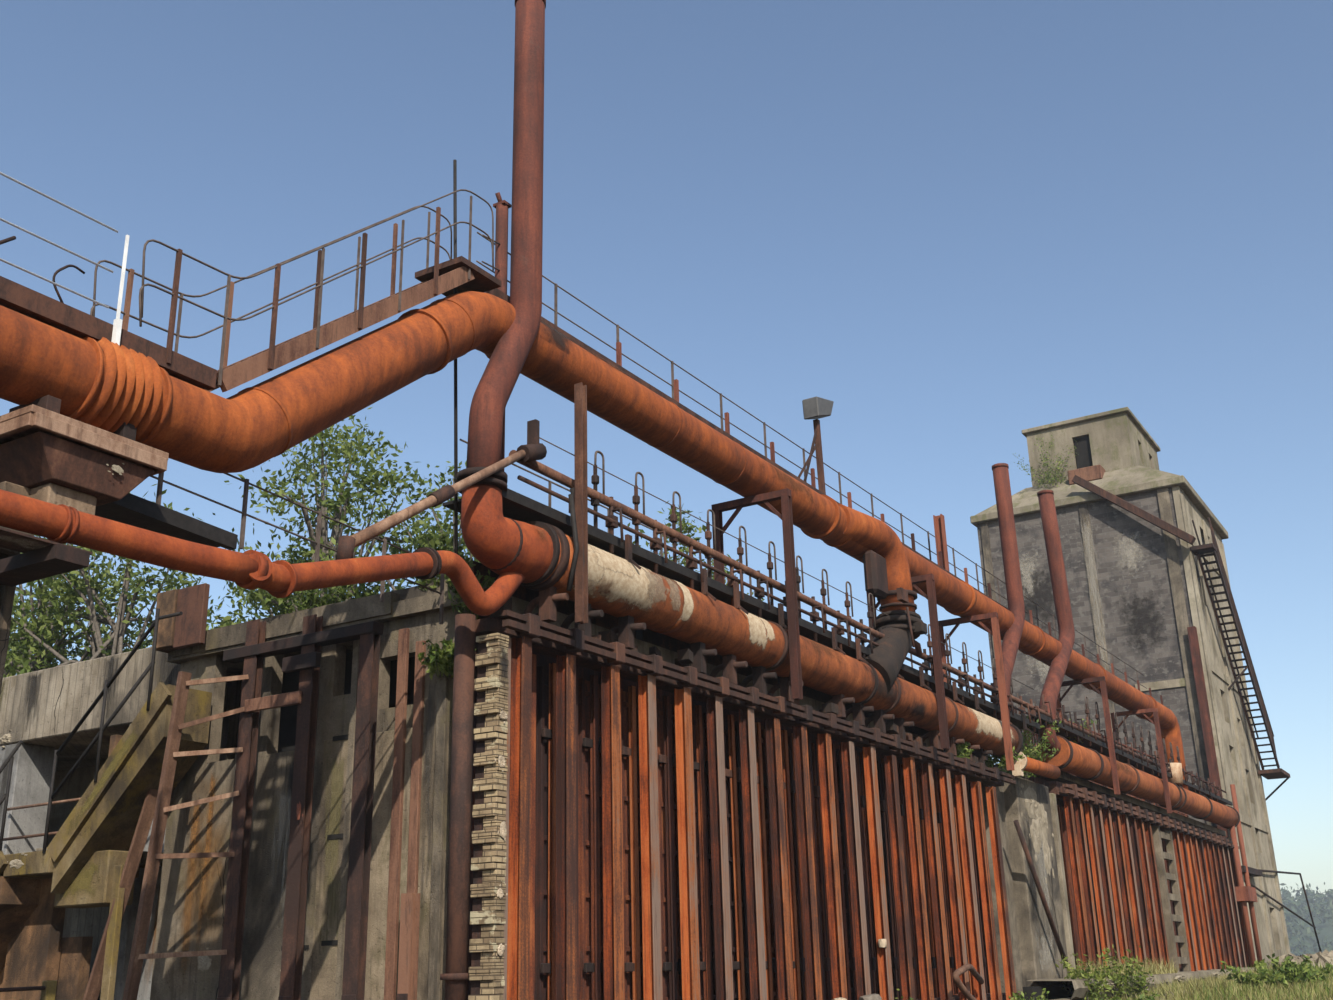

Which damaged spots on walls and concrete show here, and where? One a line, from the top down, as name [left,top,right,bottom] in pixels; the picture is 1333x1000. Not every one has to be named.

peeling [573,544,694,621]
peeling [740,609,775,649]